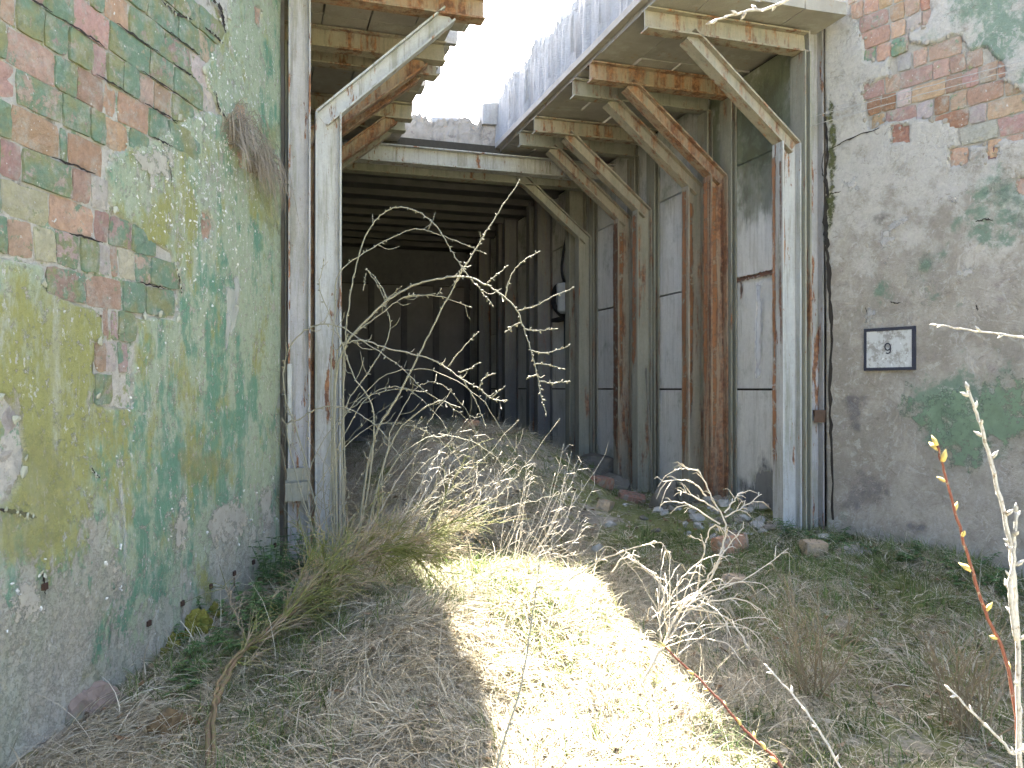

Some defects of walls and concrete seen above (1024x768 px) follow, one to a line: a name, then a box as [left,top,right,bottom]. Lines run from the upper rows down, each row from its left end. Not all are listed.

flaking render [0,393,28,502]
flaking render [0,0,248,414]
corrosion [682,181,723,454]
corrosion [737,153,786,460]
crack [822,117,879,520]
flaking render [848,0,1024,167]
peeling [898,366,1024,489]